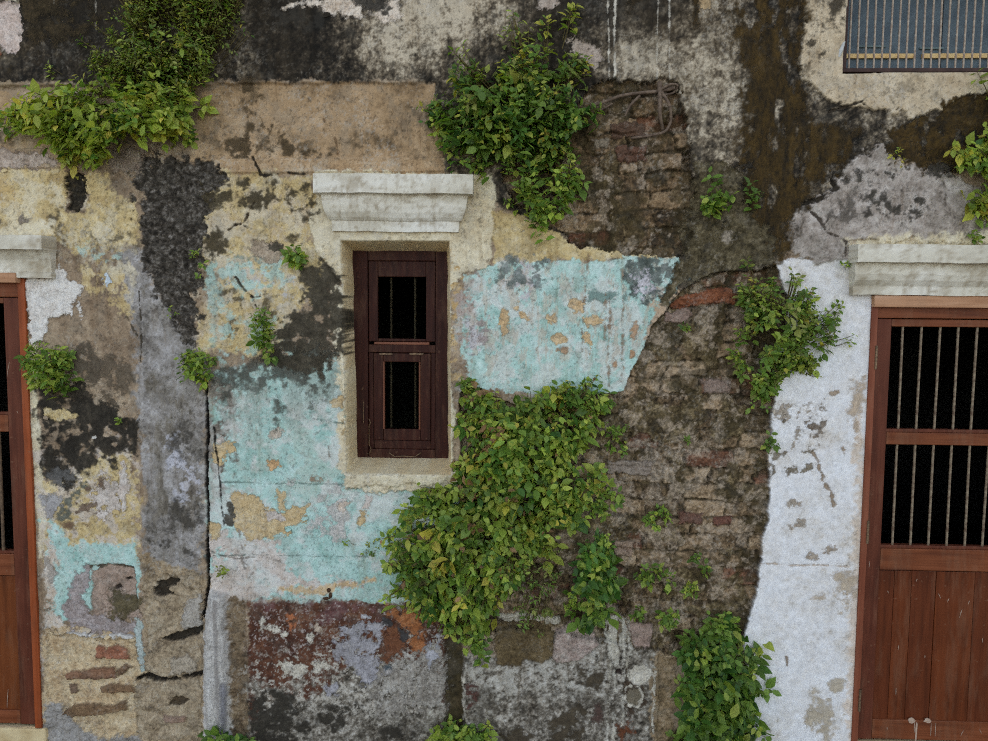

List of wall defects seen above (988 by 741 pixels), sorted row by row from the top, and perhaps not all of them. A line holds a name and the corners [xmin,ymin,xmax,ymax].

spalling [0,0,24,54]
water stain [19,0,105,47]
spalling [282,0,403,24]
water stain [607,0,640,80]
water stain [691,0,699,29]
water stain [726,0,988,272]
water stain [200,177,320,222]
water stain [203,225,229,261]
peeling [25,264,84,345]
spalling [486,36,827,667]
peeling [207,475,373,546]
spalling [43,563,206,741]